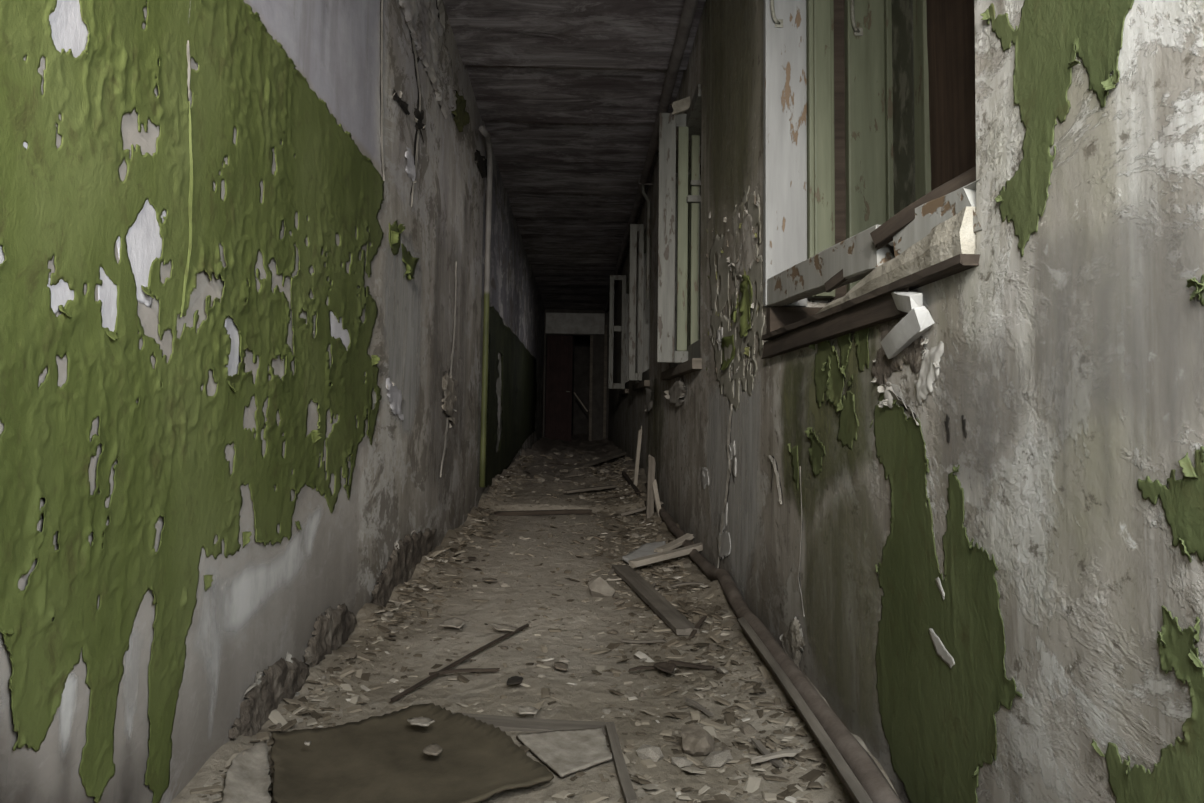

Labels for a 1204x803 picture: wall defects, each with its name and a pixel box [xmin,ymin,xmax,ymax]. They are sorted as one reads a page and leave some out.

peeling [980,0,1134,257]
peeling [706,185,765,411]
peeling [0,0,420,803]
flaking render [370,528,437,607]
peeling [716,502,731,559]
peeling [726,440,737,477]
peeling [787,318,1023,803]
peeling [1137,446,1204,563]
peeling [1091,605,1204,803]